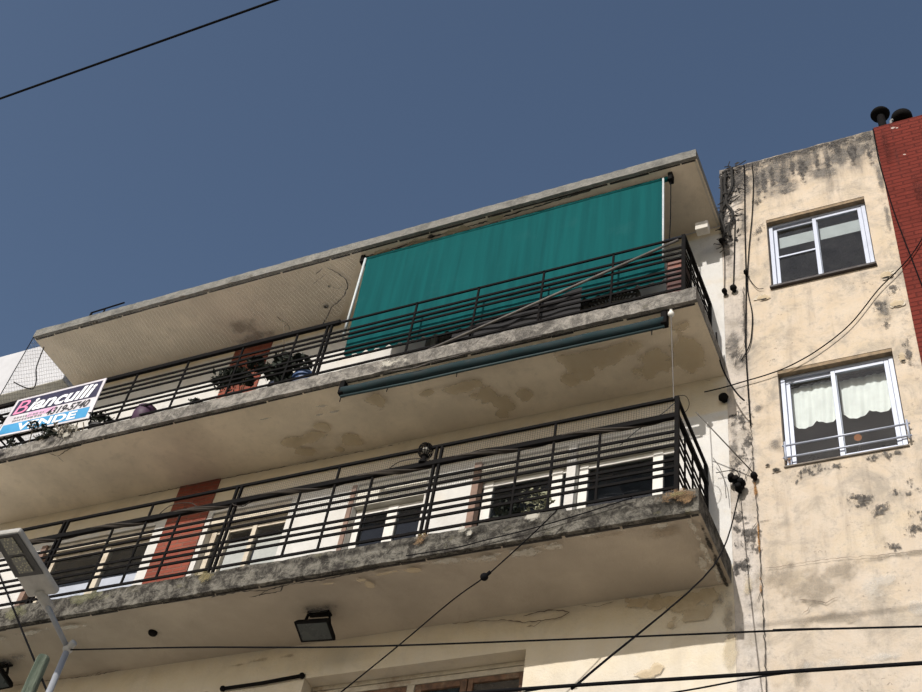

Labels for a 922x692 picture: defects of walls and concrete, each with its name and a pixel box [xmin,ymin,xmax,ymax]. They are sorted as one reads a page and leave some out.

leakage [723,132,883,240]
crack [315,268,359,323]
leakage [726,314,747,365]
leakage [729,402,761,474]
peeling [434,542,561,564]
peeling [625,519,721,629]
leakage [701,511,767,587]
leakage [847,493,890,517]
leakage [885,511,922,554]